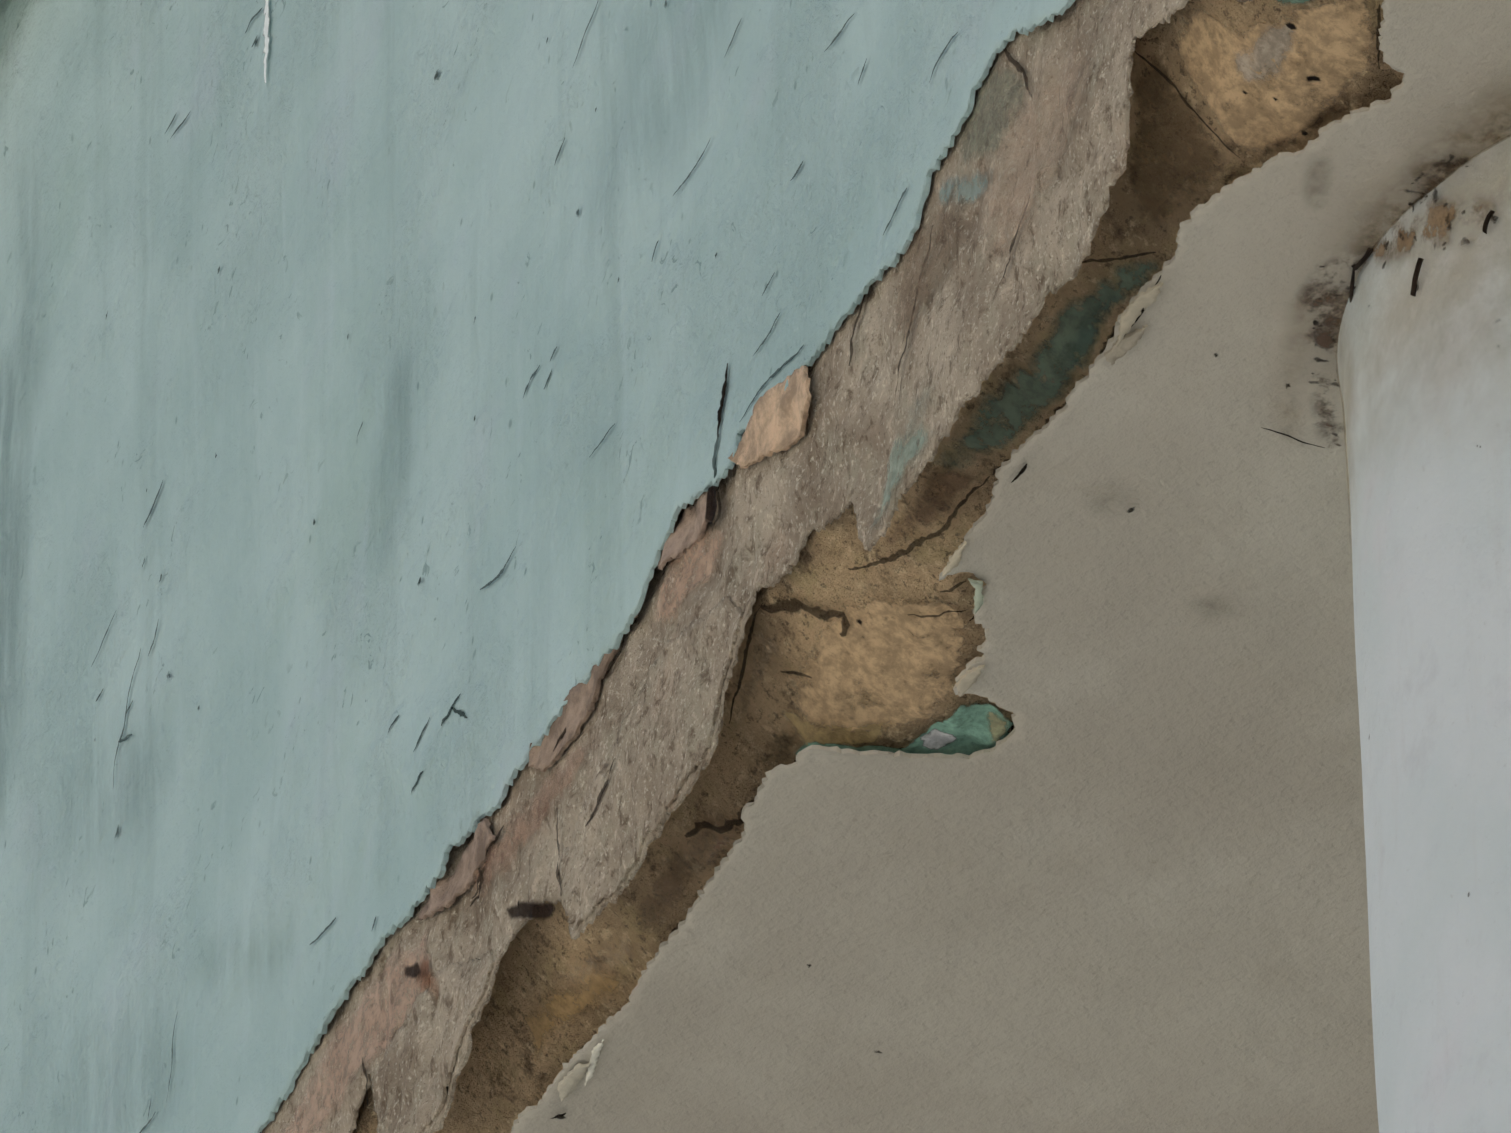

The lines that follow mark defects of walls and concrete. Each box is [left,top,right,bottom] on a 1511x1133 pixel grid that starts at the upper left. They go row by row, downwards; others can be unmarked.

leakage [1373,155,1498,268]
mould [1303,266,1348,387]
flaking render [260,0,1189,1133]